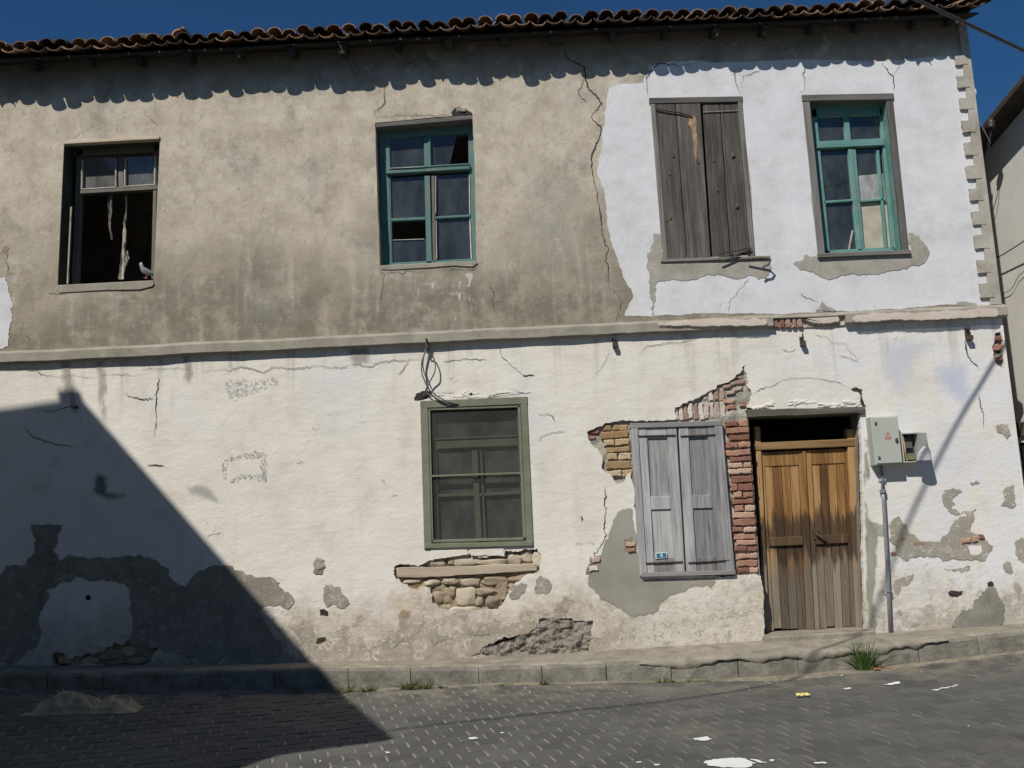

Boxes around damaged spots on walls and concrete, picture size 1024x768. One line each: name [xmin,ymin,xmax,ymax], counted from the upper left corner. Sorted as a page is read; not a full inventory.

crack [558,42,623,320]
peeling [0,277,13,349]
crack [27,406,73,447]
crack [16,351,533,430]
flaking render [586,366,760,577]
crack [588,493,607,573]
flaking render [888,481,993,572]
flaking render [0,524,294,666]
flaking render [313,557,349,616]
flaking render [394,548,552,611]
flaking render [467,618,594,657]